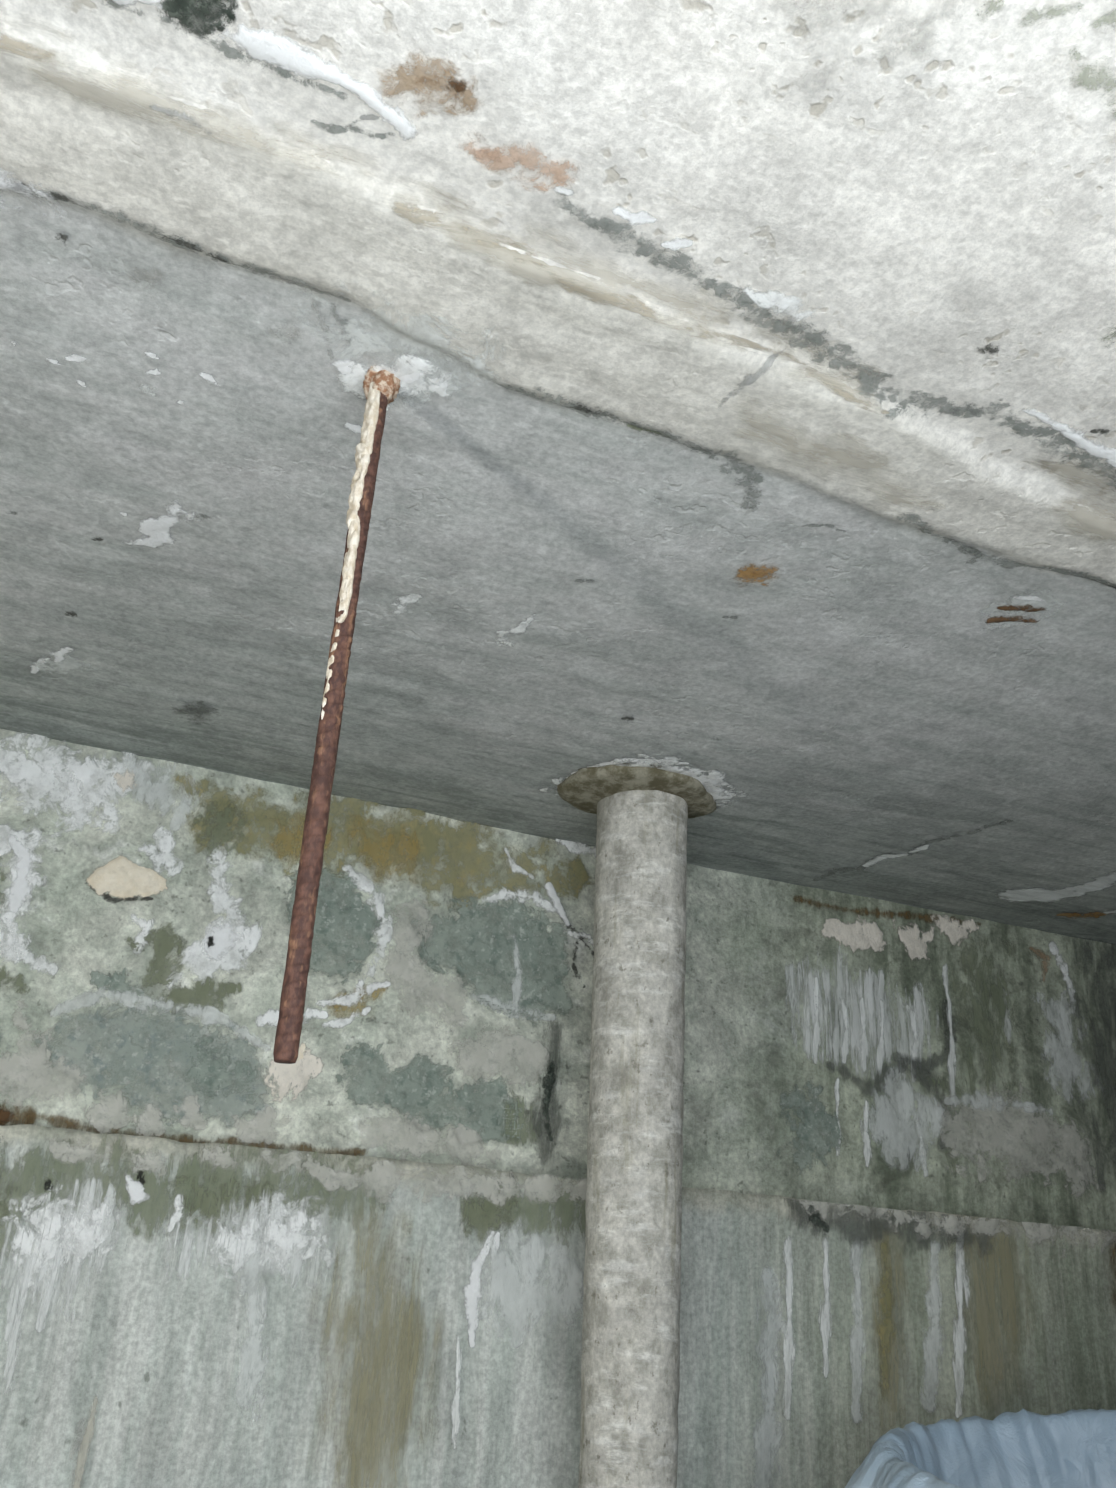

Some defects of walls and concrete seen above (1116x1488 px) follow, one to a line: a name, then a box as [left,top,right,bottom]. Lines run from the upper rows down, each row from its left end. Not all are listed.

leakage [106,0,416,140]
crack [311,114,390,139]
rust [383,57,477,115]
rust [465,143,573,191]
crack [562,201,1116,488]
crack [498,384,763,509]
rust [736,565,778,586]
peeling [30,360,587,1205]
peeling [794,896,981,960]
leakage [167,1192,436,1488]
leakage [754,1236,796,1488]
leakage [802,1200,1116,1422]